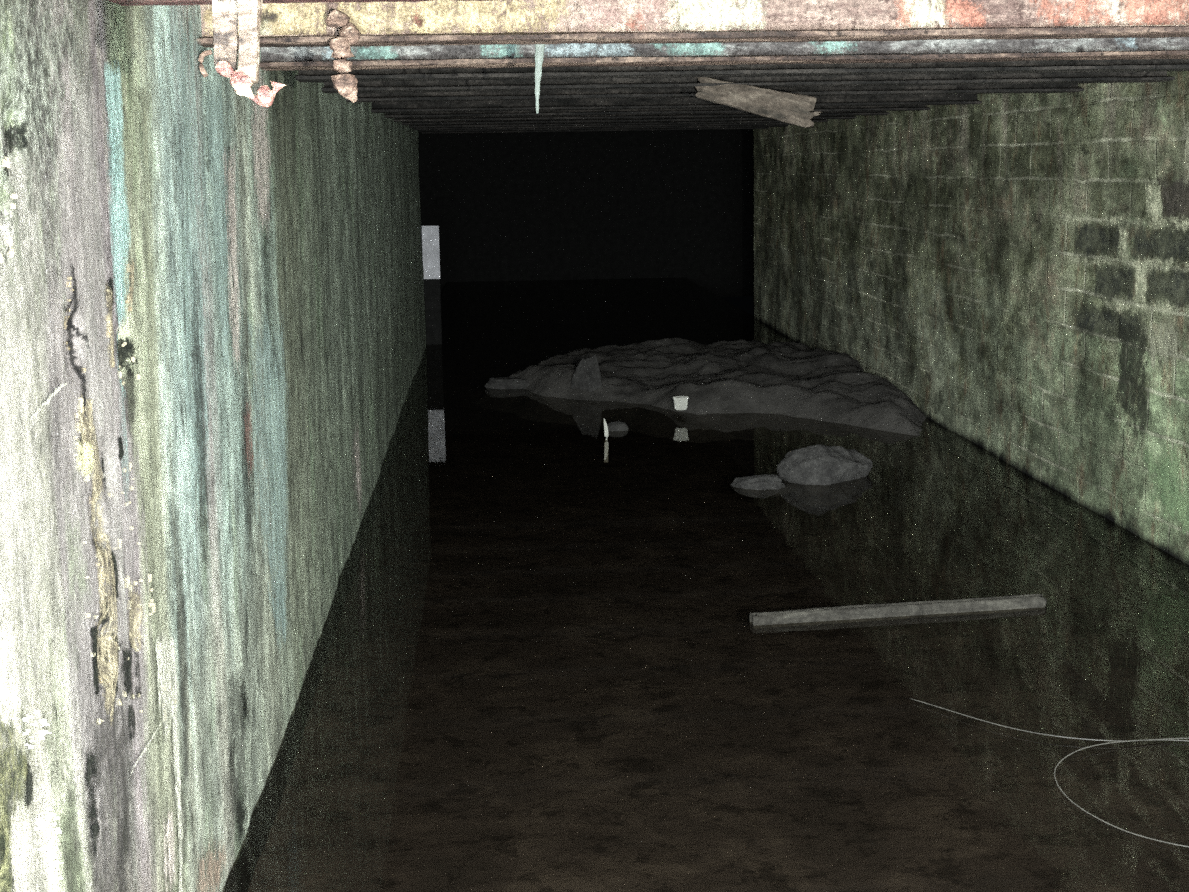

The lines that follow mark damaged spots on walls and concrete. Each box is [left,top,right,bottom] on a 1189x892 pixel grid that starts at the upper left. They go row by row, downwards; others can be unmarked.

corrosion [943,0,986,27]
corrosion [1035,0,1189,26]
crack [63,265,93,416]
damp [1116,323,1182,435]
damp [23,710,52,749]
damp [127,700,136,741]
damp [85,751,100,856]